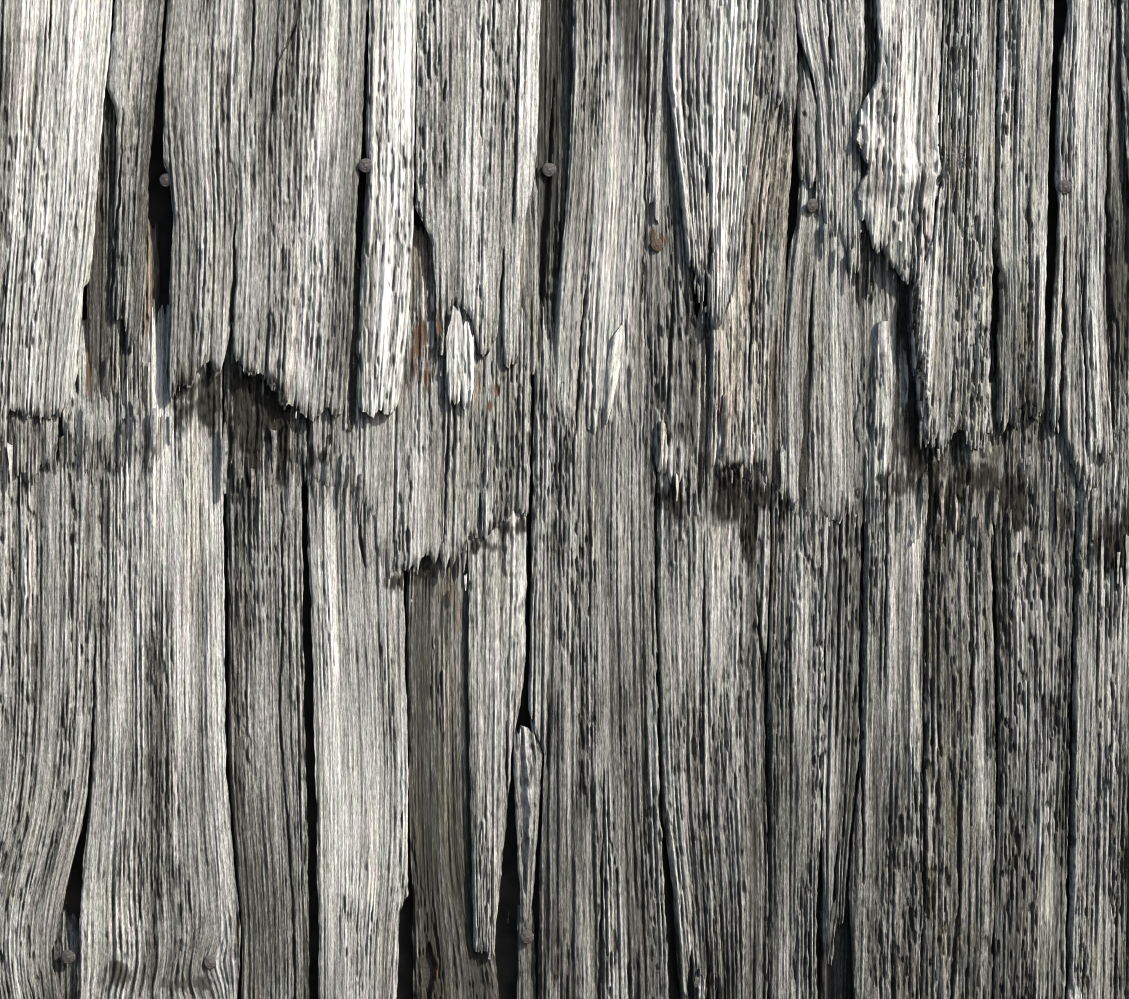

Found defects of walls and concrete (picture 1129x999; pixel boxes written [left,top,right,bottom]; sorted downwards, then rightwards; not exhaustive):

crack [110,107,124,301]